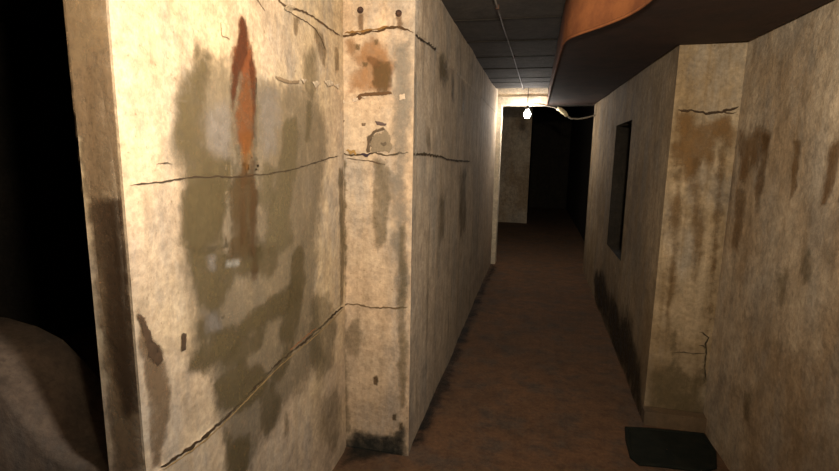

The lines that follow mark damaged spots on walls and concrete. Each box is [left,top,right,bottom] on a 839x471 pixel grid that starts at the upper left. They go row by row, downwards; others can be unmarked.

crack [258,0,436,51]
rust [353,40,392,92]
rust [231,16,257,217]
crack [134,139,469,185]
spalling [362,121,392,153]
crack [678,106,739,115]
leakage [339,161,347,303]
leakage [173,50,326,471]
leakage [415,266,495,441]
crack [161,303,406,469]
leakage [346,428,405,460]